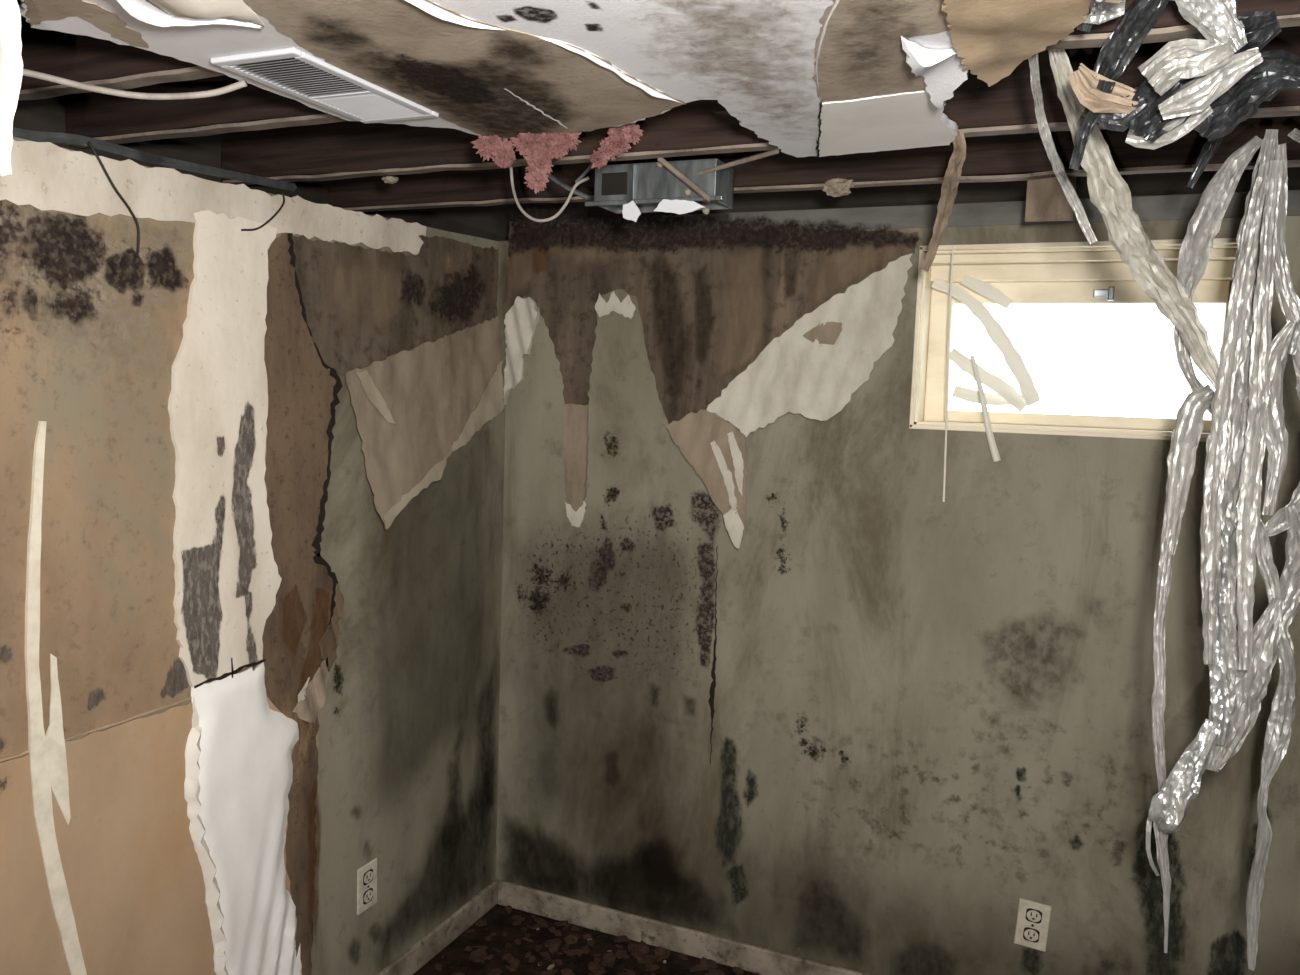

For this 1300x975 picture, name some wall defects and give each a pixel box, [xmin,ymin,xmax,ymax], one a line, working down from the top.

peeling [24,0,149,48]
leakage [312,22,567,136]
peeling [243,0,686,139]
leakage [497,6,557,23]
leakage [585,3,602,31]
peeling [812,0,948,103]
leakage [0,200,188,347]
leakage [508,205,918,256]
crack [288,233,343,626]
peeling [0,139,919,975]
leakage [518,488,719,681]
leakage [1134,820,1184,975]